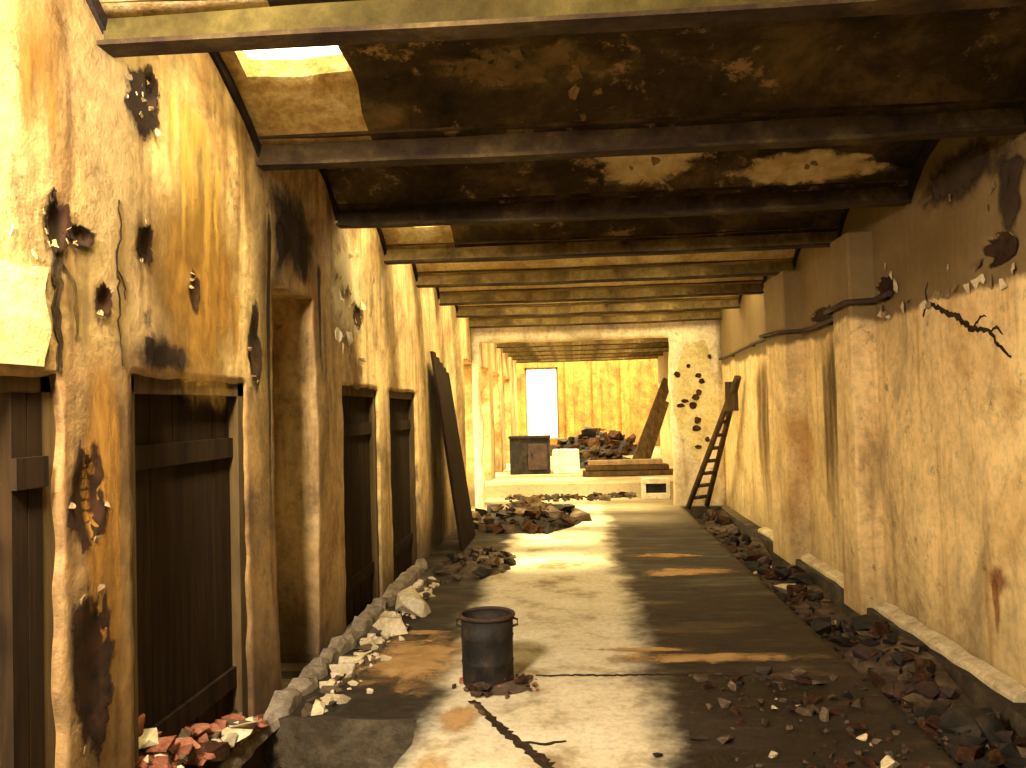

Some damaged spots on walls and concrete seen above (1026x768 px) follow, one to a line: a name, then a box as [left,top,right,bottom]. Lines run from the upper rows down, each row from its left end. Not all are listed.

flaking render [124,64,161,142]
flaking render [595,152,709,192]
flaking render [719,149,889,188]
spalling [43,193,97,254]
flaking render [0,250,51,367]
crack [115,199,126,366]
crack [922,282,1012,358]
flaking render [673,340,719,460]
spalling [66,439,111,554]
rust [990,568,1004,628]
spalling [71,582,115,767]
crack [468,700,567,768]